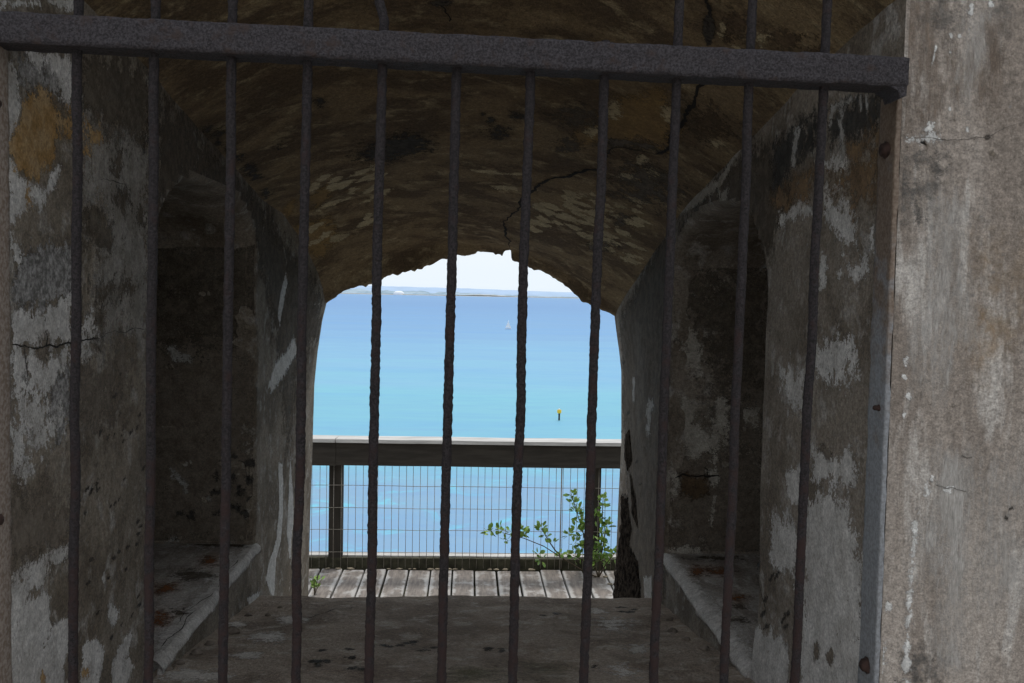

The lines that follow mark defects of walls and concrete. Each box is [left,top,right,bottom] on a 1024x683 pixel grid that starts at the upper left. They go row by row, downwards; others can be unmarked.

crack [502,84,704,248]
crack [12,328,145,377]
water stain [606,93,883,613]
peeling [777,324,862,420]
peeling [749,442,863,683]